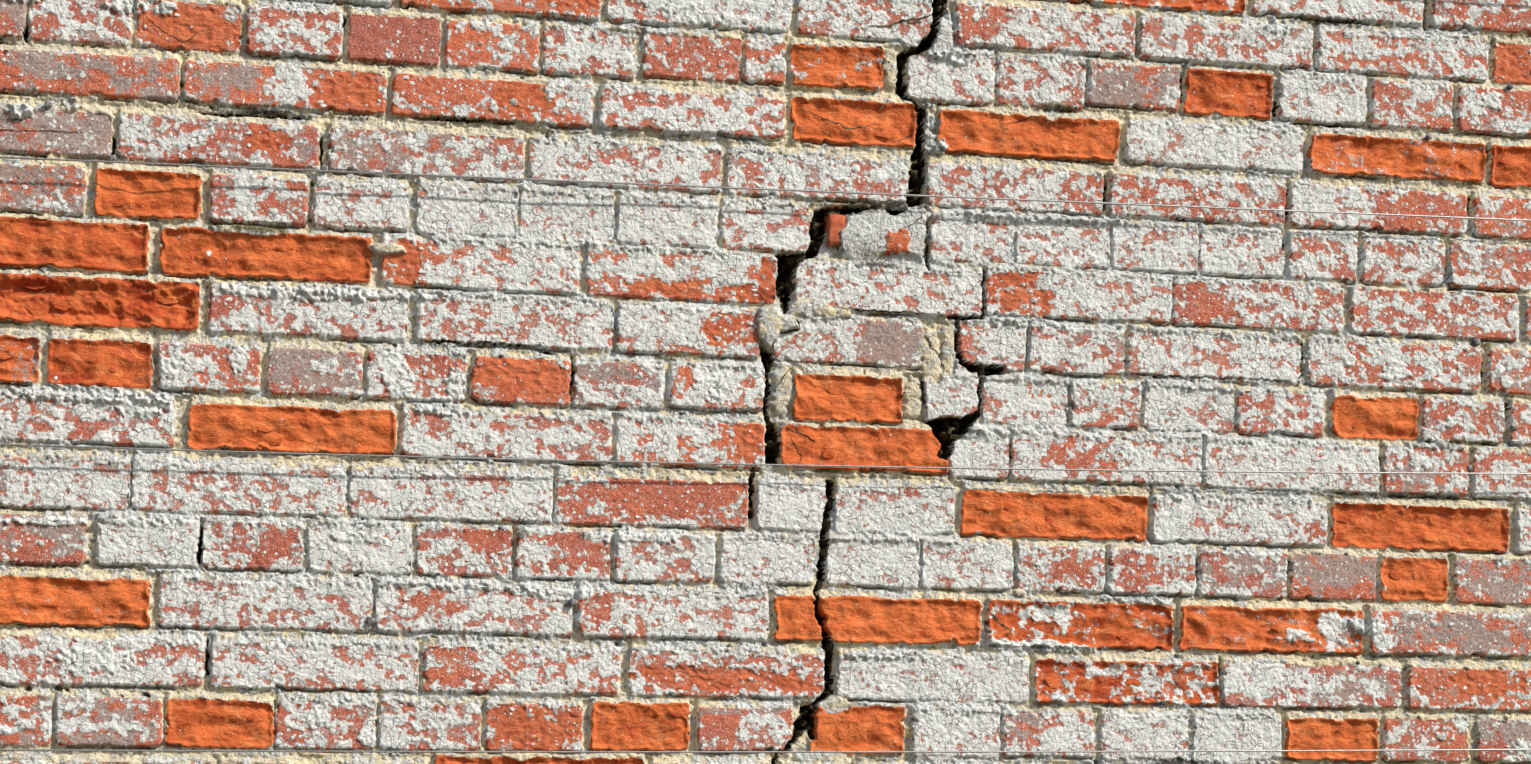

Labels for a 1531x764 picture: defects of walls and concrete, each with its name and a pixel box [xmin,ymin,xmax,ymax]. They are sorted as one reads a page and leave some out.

crack [748,0,1004,764]